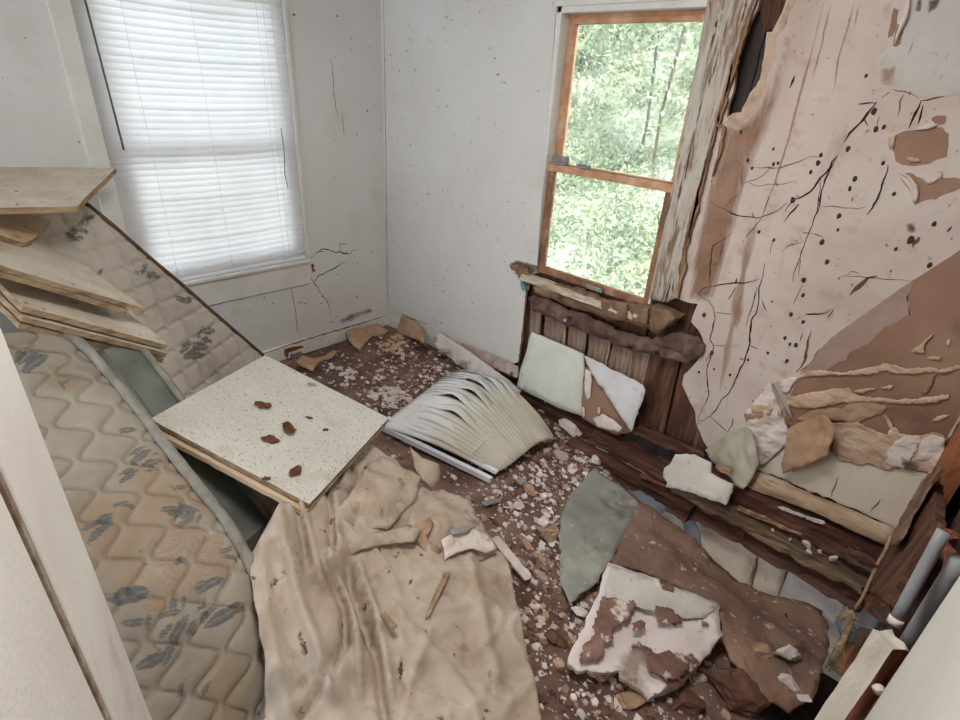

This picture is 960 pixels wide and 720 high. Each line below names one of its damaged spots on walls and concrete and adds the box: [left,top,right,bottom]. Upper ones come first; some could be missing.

spalling [726,0,796,130]
peeling [877,0,960,97]
peeling [888,115,960,205]
crack [267,243,388,353]
spalling [532,283,685,334]
crack [698,89,944,431]
peeling [785,250,960,445]
peeling [705,427,759,489]
peeling [789,538,838,561]